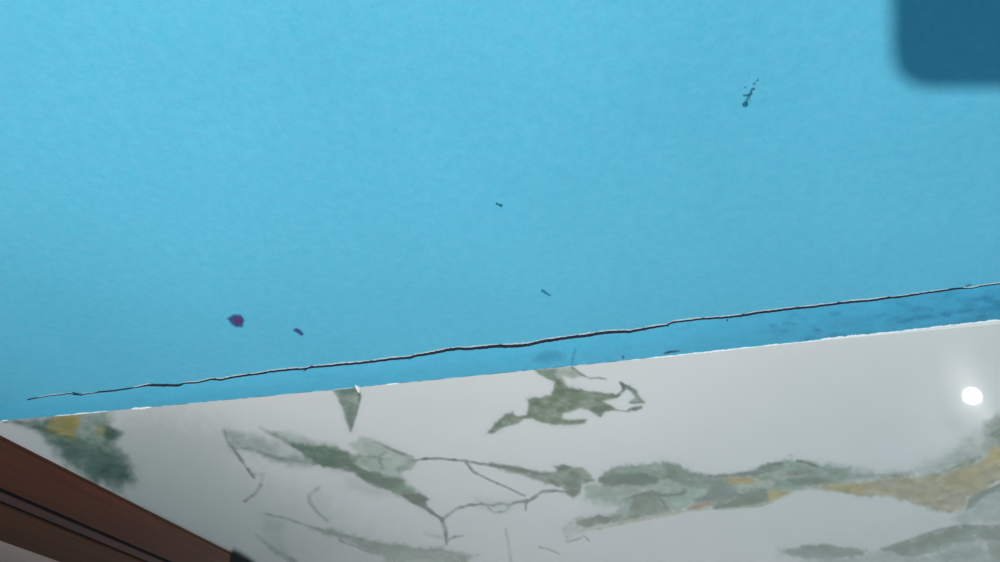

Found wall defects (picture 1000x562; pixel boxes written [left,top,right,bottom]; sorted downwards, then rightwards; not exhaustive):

crack [27,282,1000,400]